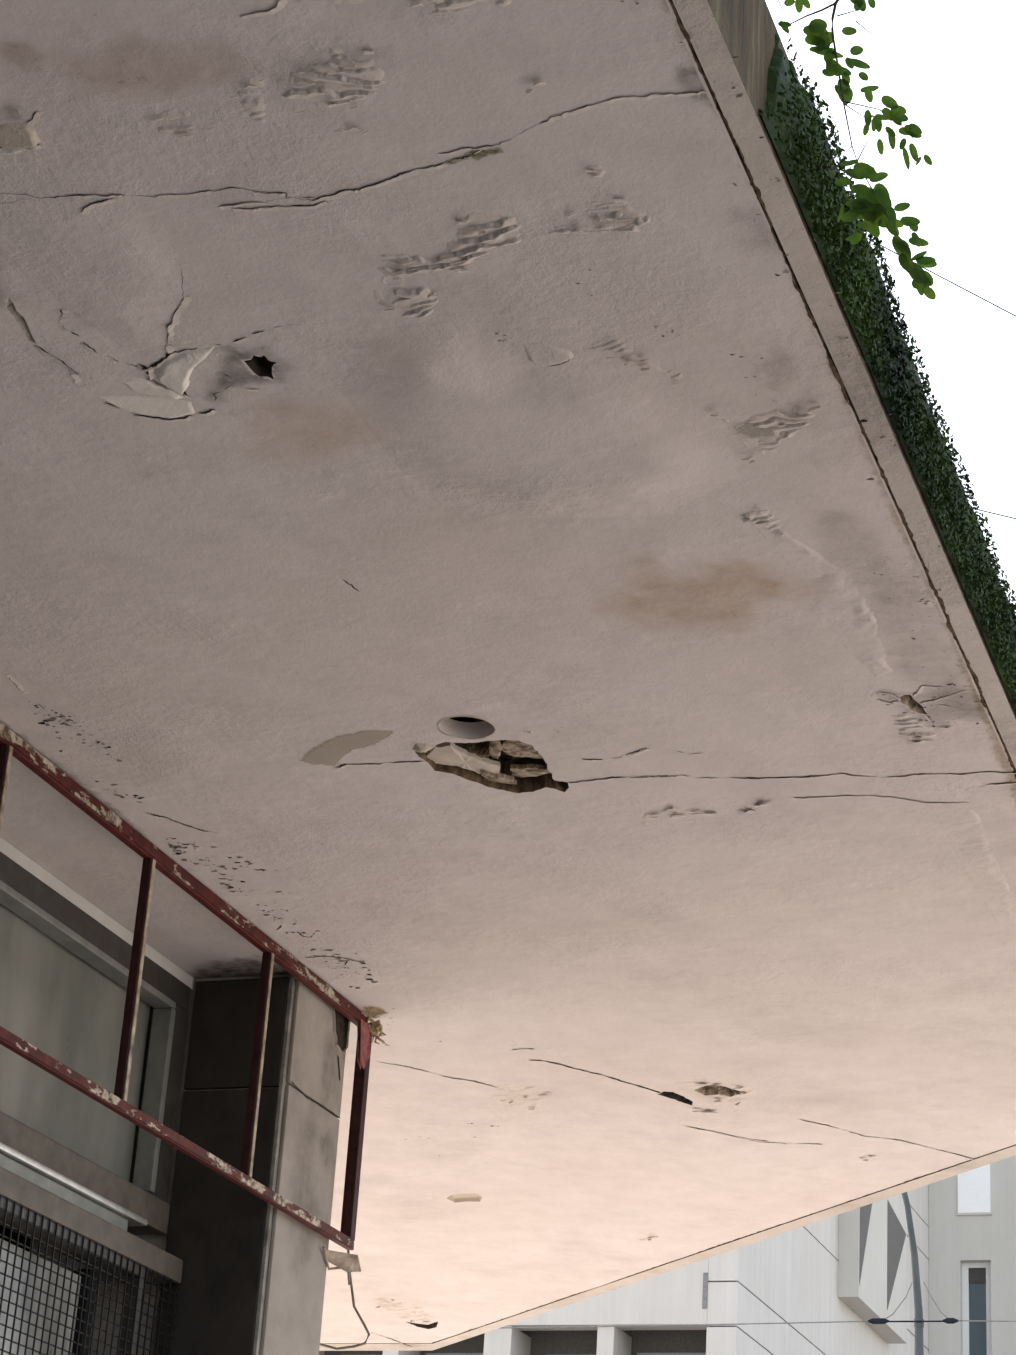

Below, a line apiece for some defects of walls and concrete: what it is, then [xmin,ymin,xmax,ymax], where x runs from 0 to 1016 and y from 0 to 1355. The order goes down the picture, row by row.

crack [1,90,707,215]
crack [32,266,301,423]
peeling [884,657,976,744]
peeling [302,731,393,766]
spalling [412,740,569,793]
crack [569,749,1016,805]
peeling [0,701,376,1053]
crack [292,1056,340,1118]
crack [378,1062,498,1088]
crack [512,1049,661,1094]
peeling [658,1079,759,1114]
crack [686,1119,973,1160]